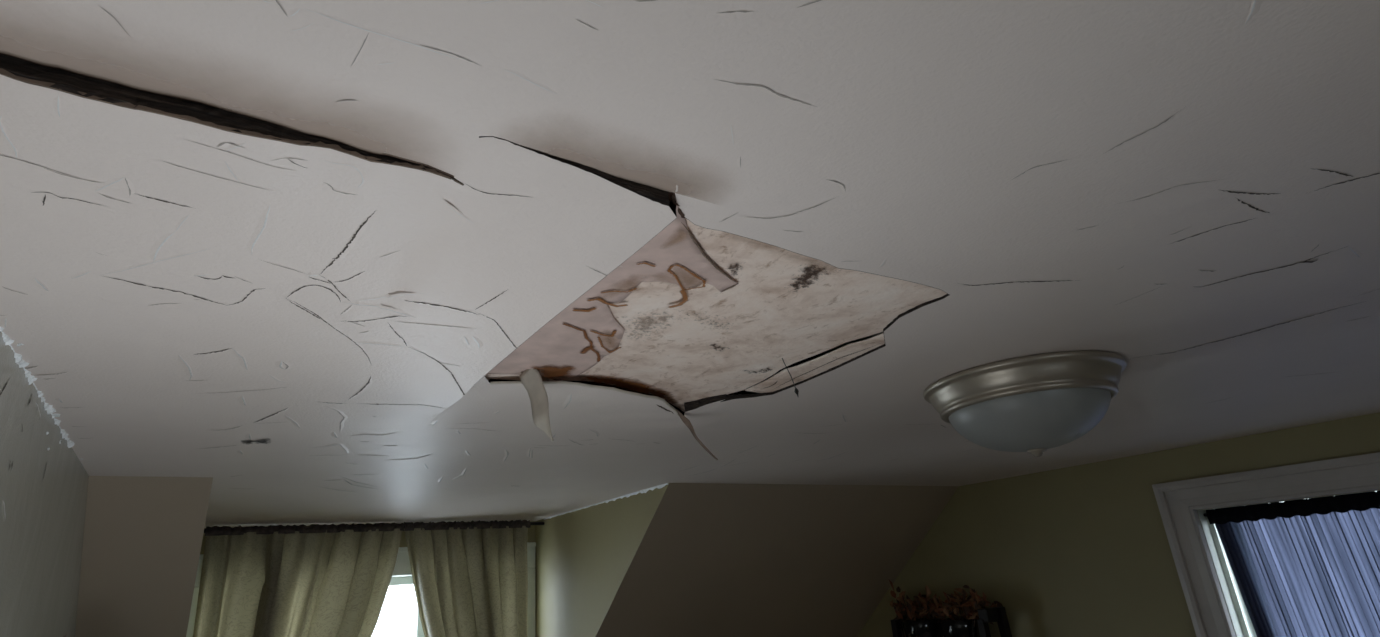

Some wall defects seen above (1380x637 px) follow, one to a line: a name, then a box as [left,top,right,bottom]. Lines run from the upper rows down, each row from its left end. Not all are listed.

crack [0,52,529,197]
crack [31,192,198,209]
crack [479,136,687,219]
crack [1167,168,1380,245]
crack [319,210,377,275]
crack [956,279,1080,287]
crack [1192,246,1348,287]
crack [103,276,443,423]
crack [404,289,516,348]
flaking render [485,374,522,385]
flaking render [541,219,947,417]